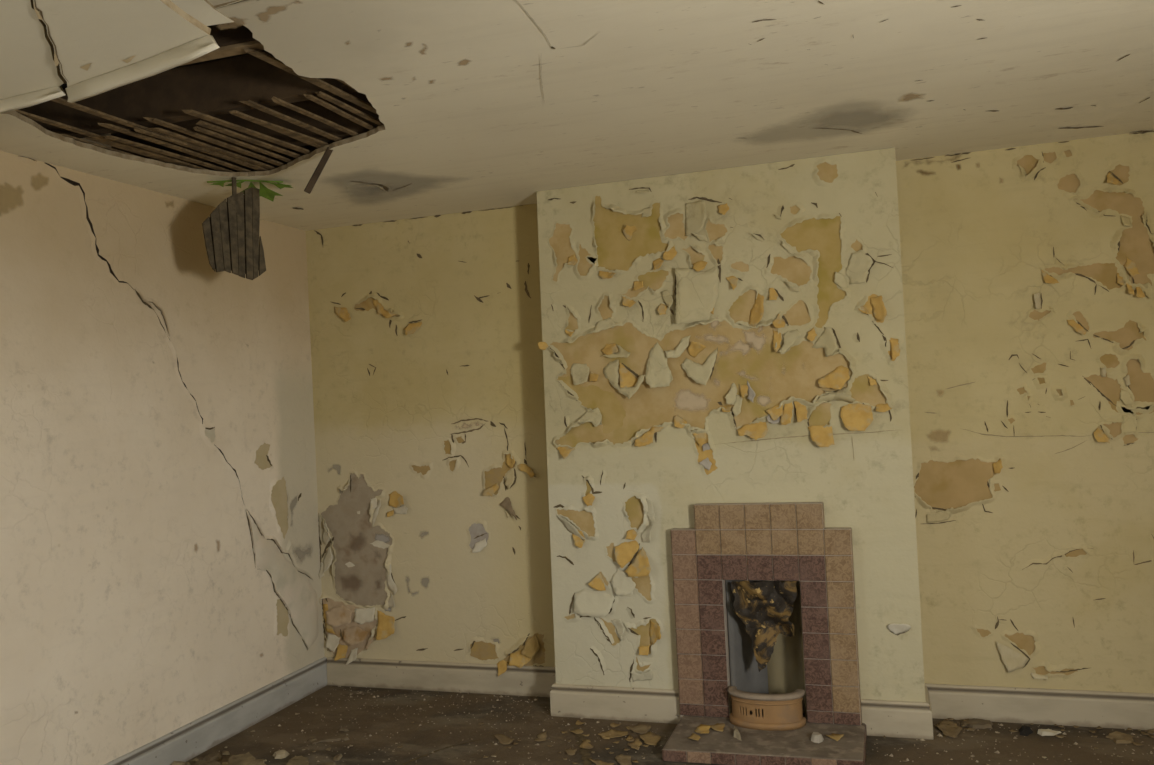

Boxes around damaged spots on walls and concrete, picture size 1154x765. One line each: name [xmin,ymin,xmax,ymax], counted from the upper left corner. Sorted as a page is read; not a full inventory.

crack [34,0,68,81]
peeling [219,18,244,29]
peeling [330,291,422,335]
peeling [538,187,904,478]
peeling [1003,145,1154,448]
crack [18,156,313,650]
flaking render [318,469,408,665]
peeling [409,418,536,530]
peeling [465,519,491,553]
peeling [554,470,664,683]
peeling [913,453,1013,524]
peeling [454,630,547,676]